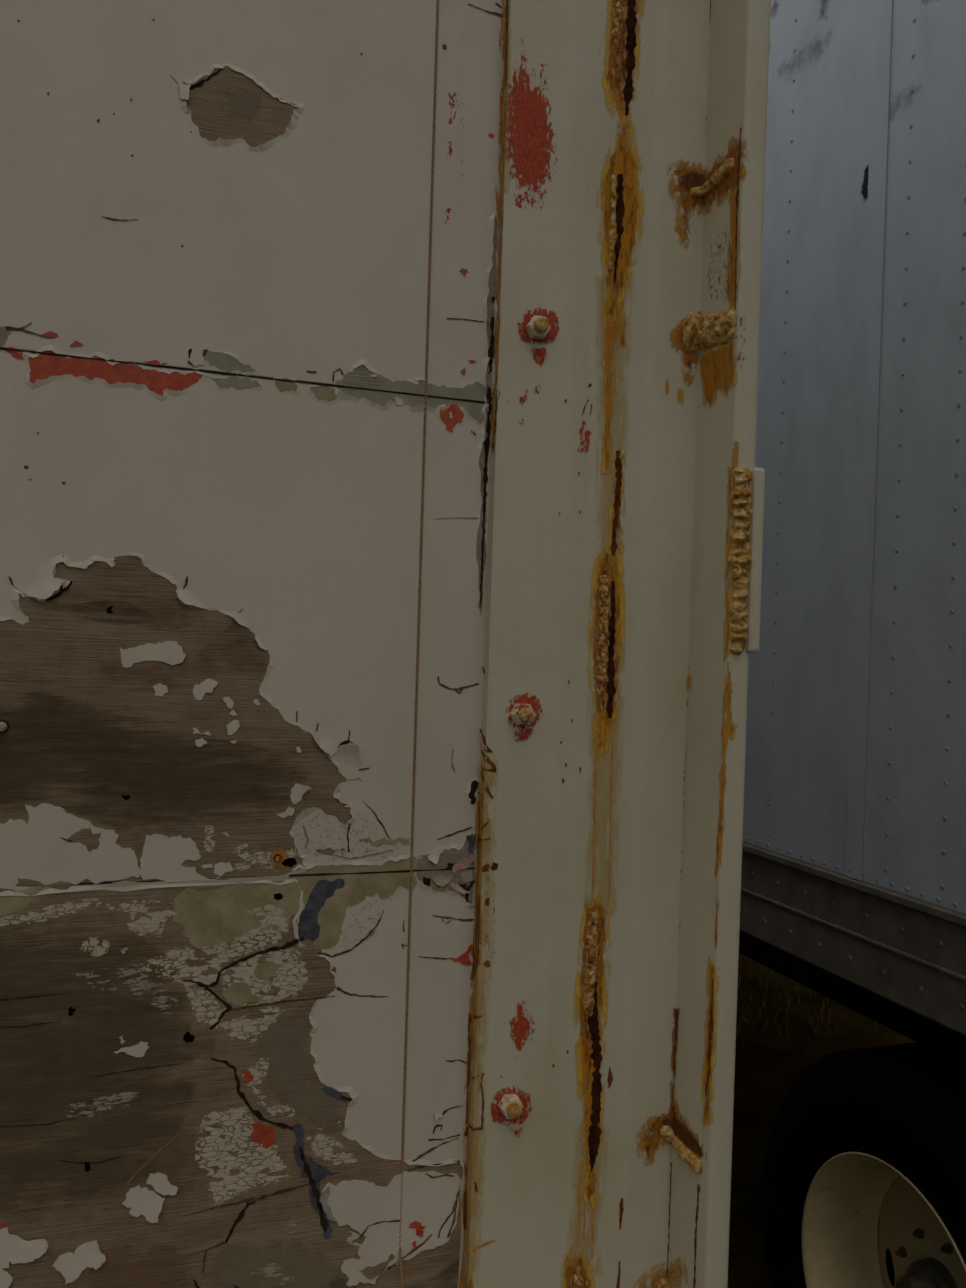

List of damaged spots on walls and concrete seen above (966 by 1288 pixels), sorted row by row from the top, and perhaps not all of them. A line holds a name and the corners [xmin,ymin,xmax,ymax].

peeling [171,62,303,152]
peeling [0,212,499,617]
corrosion [491,0,508,454]
peeling [489,39,558,208]
corrosion [666,127,746,407]
peeling [0,551,477,1288]
crack [183,937,389,1288]
crack [419,915,474,966]
corrosion [458,729,498,1288]
corrosion [561,0,644,1288]
corrosion [616,1163,700,1288]
corrosion [637,442,739,1165]